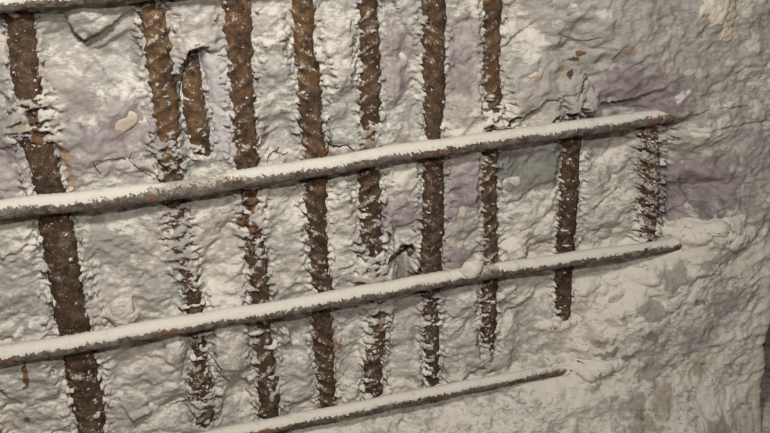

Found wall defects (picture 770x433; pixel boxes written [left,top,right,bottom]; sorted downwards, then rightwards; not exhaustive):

rust [559,51,588,79]
rust [17,108,44,147]
spalling [0,0,735,346]
rust [236,195,260,236]
spalling [0,245,700,433]
rust [21,362,29,389]